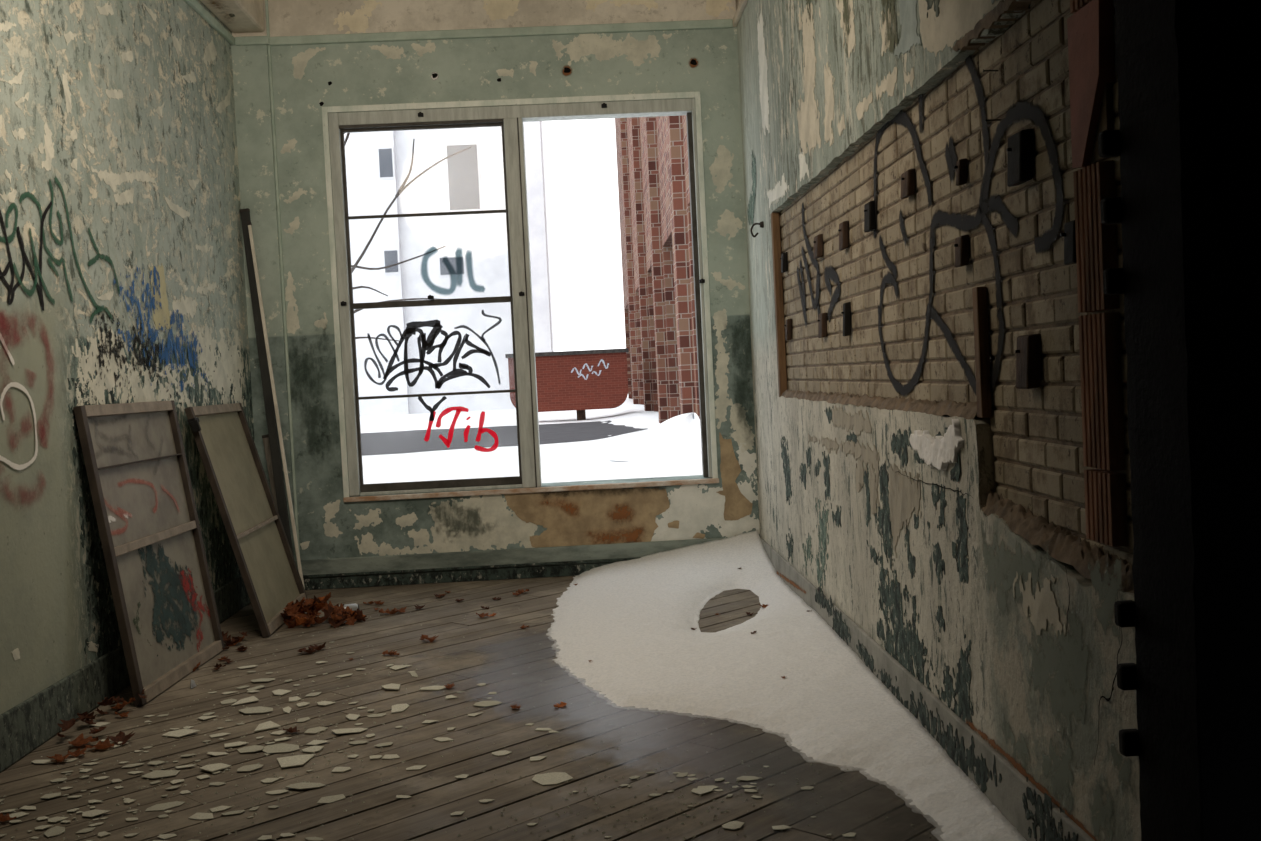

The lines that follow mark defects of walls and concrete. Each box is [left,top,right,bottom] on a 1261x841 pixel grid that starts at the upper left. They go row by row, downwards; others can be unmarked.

peeling [62,73,72,114]
peeling [333,0,436,59]
peeling [552,31,675,76]
peeling [757,9,770,135]
peeling [767,0,1033,208]
peeling [0,169,17,203]
peeling [38,123,190,219]
flaking render [323,309,760,556]
leakage [544,487,664,496]
peeling [781,405,1002,793]
peeling [1013,572,1067,638]
peeling [1022,778,1078,841]